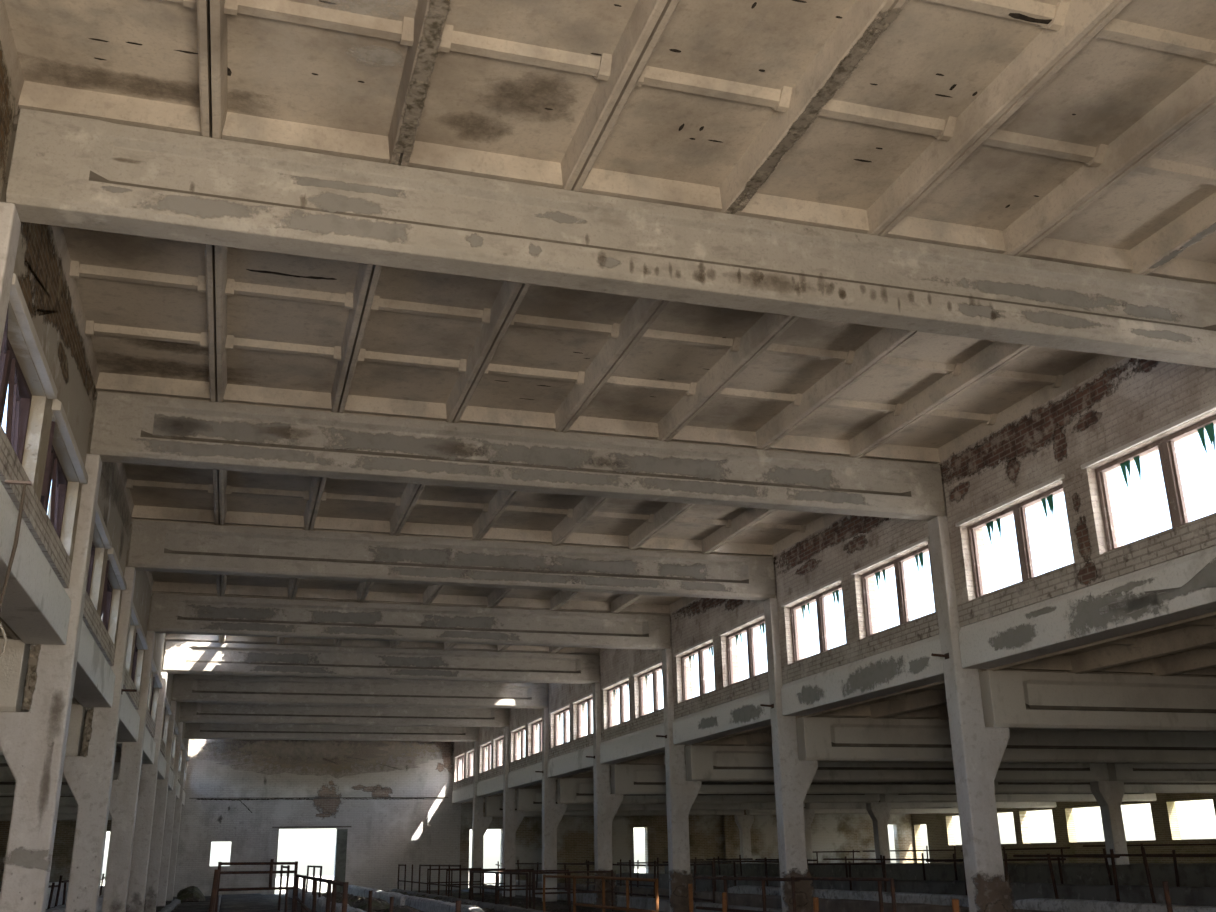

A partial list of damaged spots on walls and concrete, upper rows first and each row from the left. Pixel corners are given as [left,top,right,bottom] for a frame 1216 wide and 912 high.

peeling [0,41,19,182]
spalling [393,0,450,162]
spalling [727,9,901,213]
peeling [18,221,96,405]
peeling [939,358,1160,502]
peeling [675,598,744,619]
peeling [774,515,889,575]
peeling [313,781,392,818]